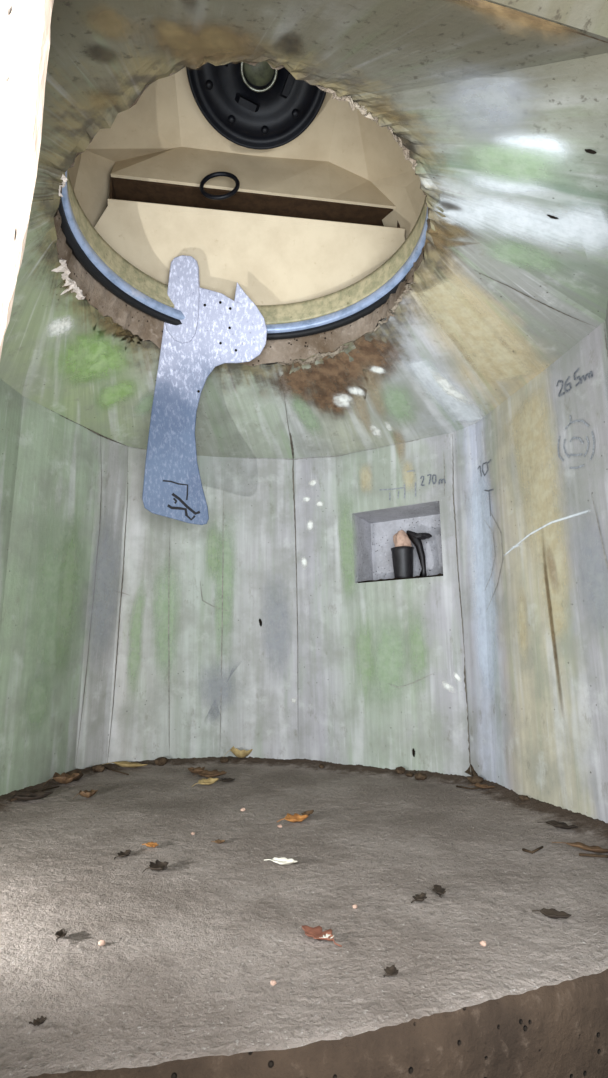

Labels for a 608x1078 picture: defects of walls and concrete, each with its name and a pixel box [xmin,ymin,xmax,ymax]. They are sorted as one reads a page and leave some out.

crack [458,0,608,43]
spalling [320,88,417,170]
corrosion [277,335,394,424]